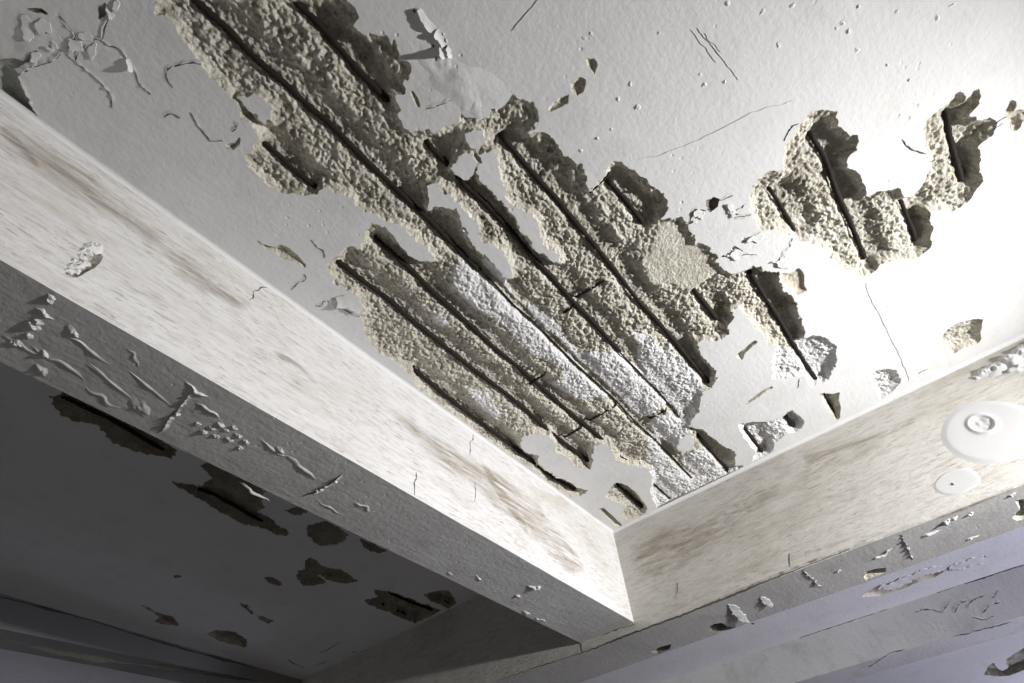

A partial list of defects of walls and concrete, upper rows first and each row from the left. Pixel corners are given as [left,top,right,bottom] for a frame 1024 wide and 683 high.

peeling [97,0,120,20]
peeling [0,8,97,114]
crack [691,28,738,80]
crack [638,100,798,160]
flaking render [64,242,103,277]
spalling [153,0,1024,536]
spalling [48,391,177,459]
spalling [284,507,386,553]
spalling [296,557,358,586]
spalling [365,590,457,623]
peeling [708,604,755,633]
spalling [984,648,1024,676]